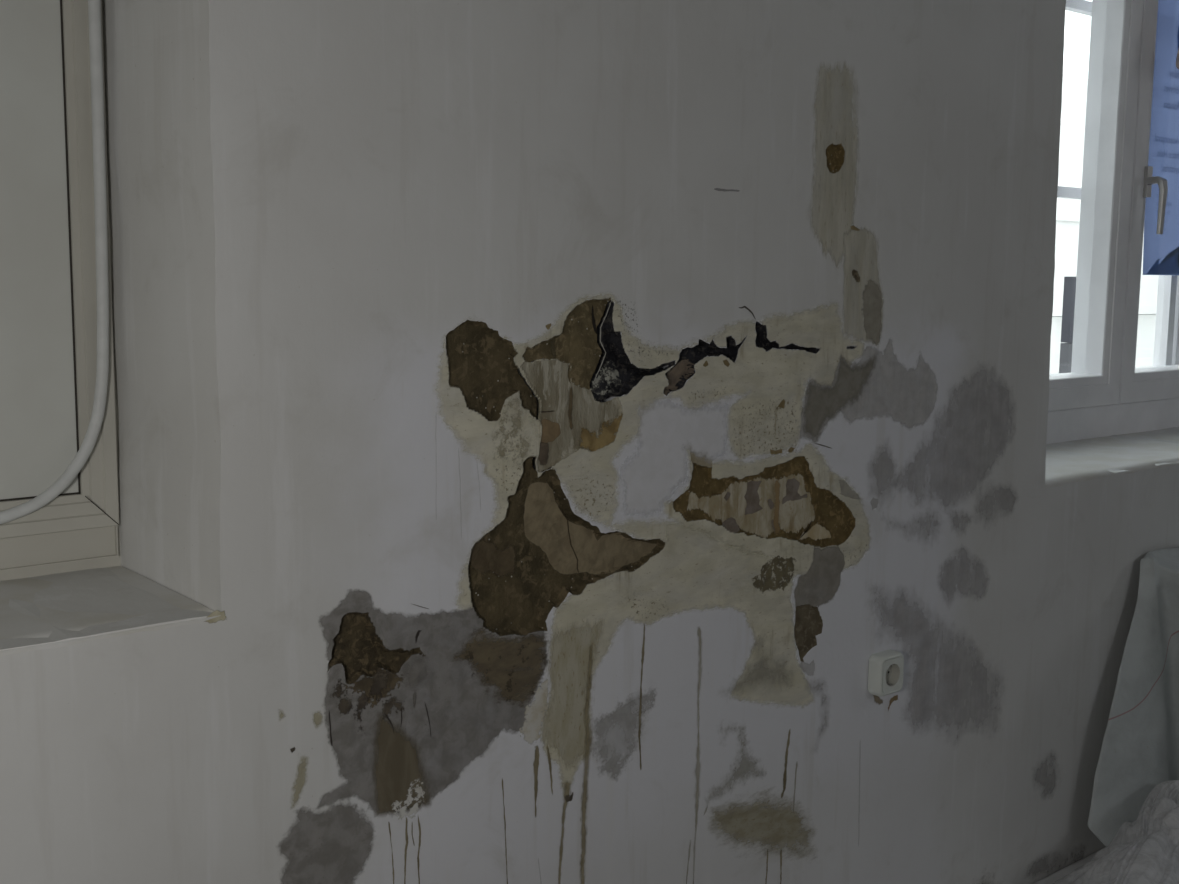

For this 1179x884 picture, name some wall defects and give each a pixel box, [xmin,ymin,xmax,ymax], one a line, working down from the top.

spalling [826,143,845,173]
crack [590,299,856,402]
spalling [446,297,665,636]
spalling [672,447,860,548]
spalling [327,612,426,684]
spalling [794,604,823,662]
leakage [879,595,998,725]
leakage [280,590,547,884]
peeling [519,679,551,745]
leakage [596,693,655,777]
peeling [389,779,425,819]